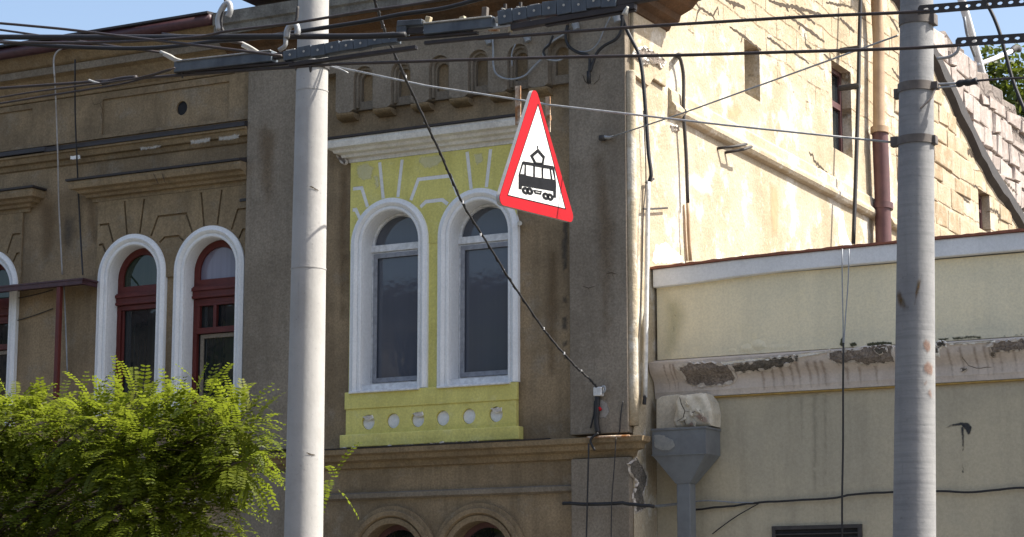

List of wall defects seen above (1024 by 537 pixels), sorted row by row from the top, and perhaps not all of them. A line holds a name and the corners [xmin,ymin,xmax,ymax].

flaking render [935,337,1024,357]
flaking render [654,344,895,450]
flaking render [627,457,648,514]